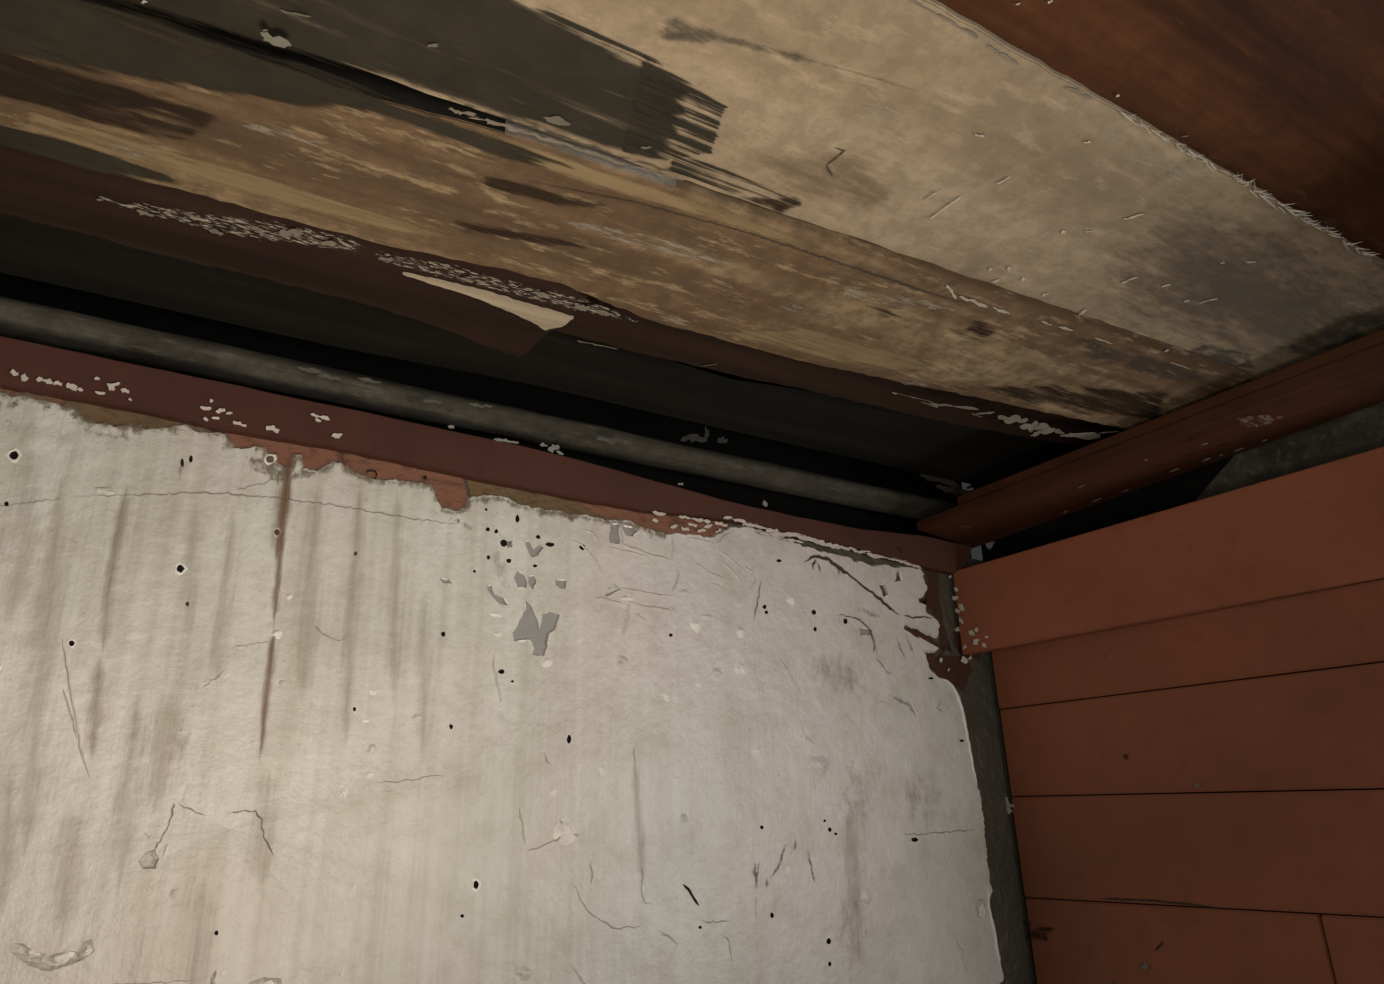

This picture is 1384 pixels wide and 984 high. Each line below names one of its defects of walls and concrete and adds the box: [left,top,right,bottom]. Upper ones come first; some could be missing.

water stain [0,0,802,212]
peeling [10,369,132,401]
peeling [200,399,247,427]
peeling [310,413,343,438]
peeling [892,392,1120,440]
corrosion [274,467,290,615]
peeling [652,511,922,597]
peeling [487,571,559,656]
crack [805,555,929,674]
peeling [939,575,989,671]
corrosion [261,637,274,748]
flaking render [9,939,95,972]